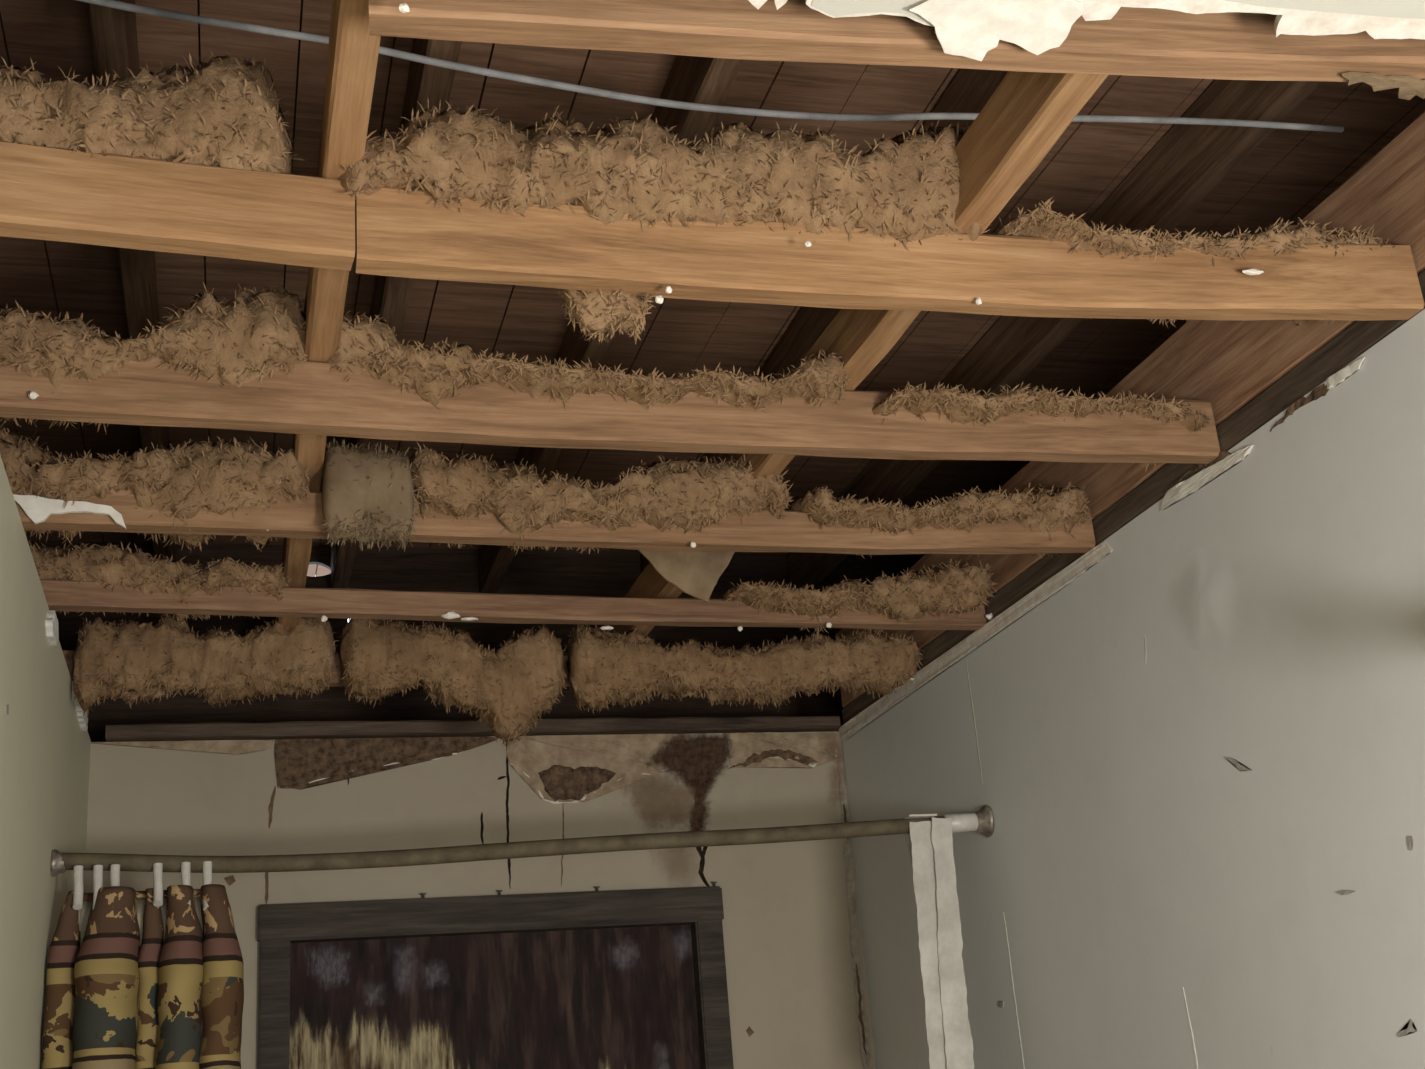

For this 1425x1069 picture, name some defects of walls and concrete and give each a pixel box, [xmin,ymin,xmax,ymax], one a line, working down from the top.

flaking render [1270,384,1329,432]
flaking render [1160,451,1232,496]
peeling [45,610,59,646]
flaking render [72,681,692,804]
water stain [636,734,729,831]